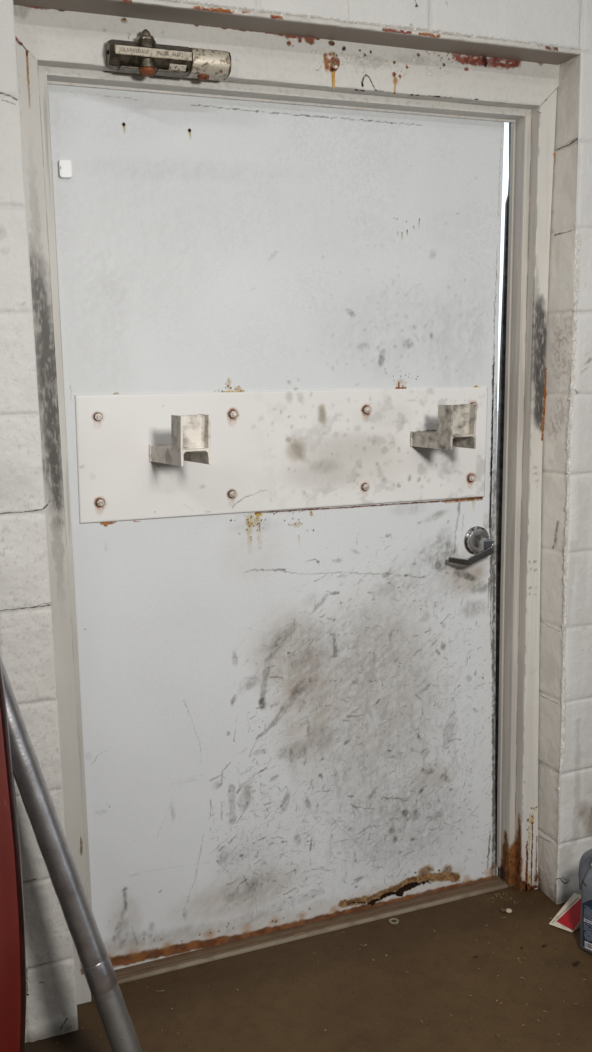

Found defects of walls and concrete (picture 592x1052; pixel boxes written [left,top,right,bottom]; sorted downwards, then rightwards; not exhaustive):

corrosion [194,6,245,14]
corrosion [222,28,346,89]
corrosion [443,54,521,71]
corrosion [246,497,483,540]
corrosion [110,806,541,967]